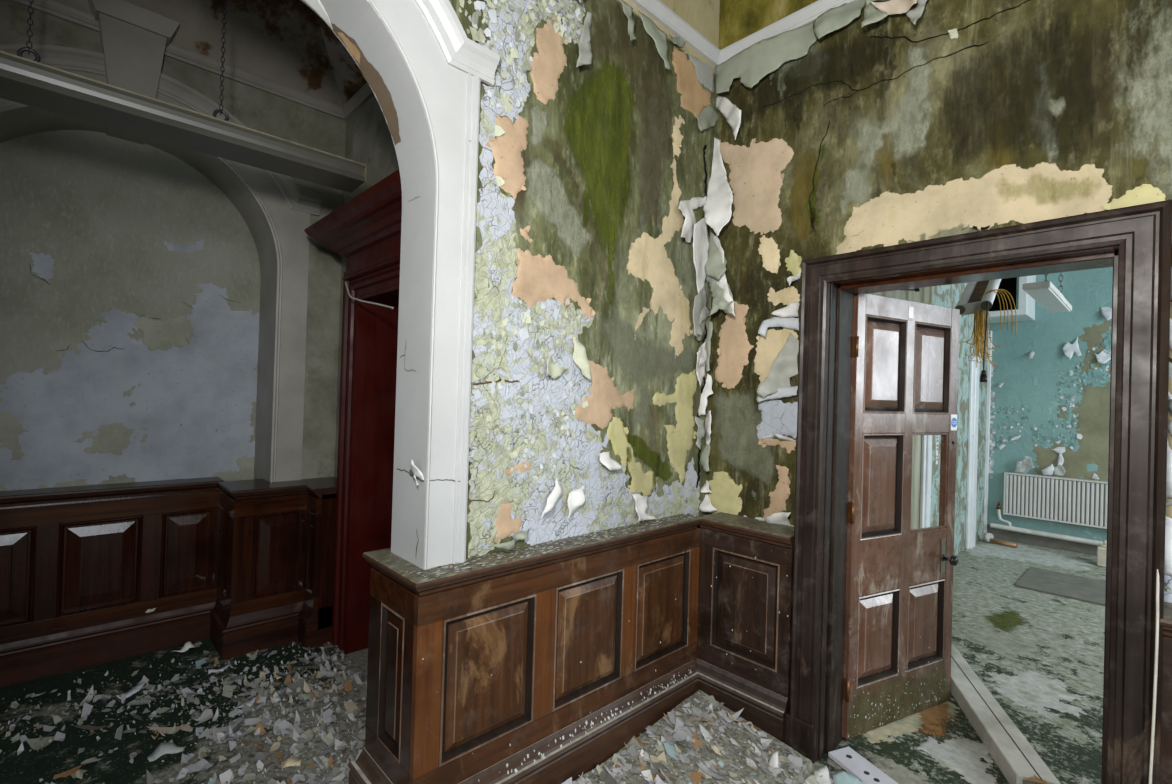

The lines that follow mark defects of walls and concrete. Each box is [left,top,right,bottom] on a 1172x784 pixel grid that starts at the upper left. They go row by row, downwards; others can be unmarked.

leakage [527,159,596,259]
peeling [459,0,927,558]
leakage [751,37,895,128]
leakage [841,48,931,213]
crack [764,0,1030,228]
leakage [920,225,977,241]
flaking render [836,162,1166,255]
leakage [947,21,1098,166]
leakage [1119,17,1172,188]
peeling [0,282,259,491]
flaking render [989,307,1112,481]
peeling [1164,267,1172,603]